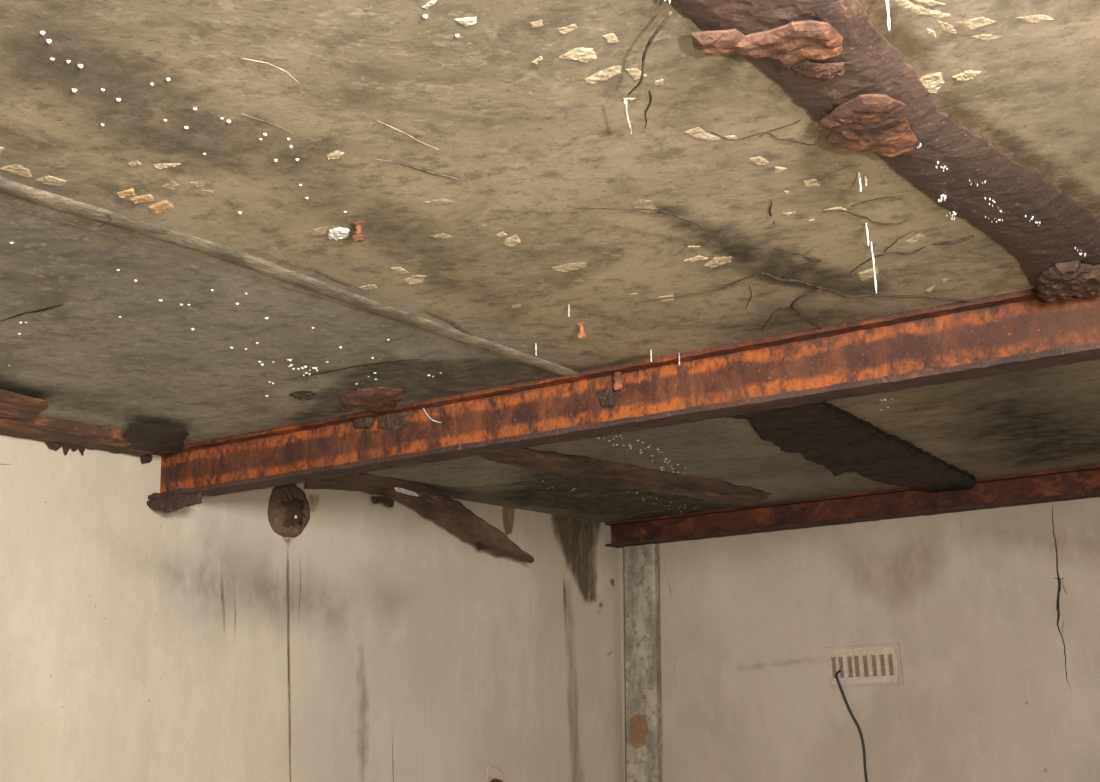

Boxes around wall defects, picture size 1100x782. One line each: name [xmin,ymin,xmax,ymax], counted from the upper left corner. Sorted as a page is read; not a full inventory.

corrosion [692,20,845,80]
corrosion [868,0,915,50]
water stain [36,44,150,107]
corrosion [817,94,919,157]
corrosion [942,100,1100,221]
corrosion [597,388,619,408]
corrosion [45,442,85,455]
corrosion [147,492,202,513]
corrosion [371,496,394,508]
corrosion [503,507,515,534]
crack [1052,503,1069,684]